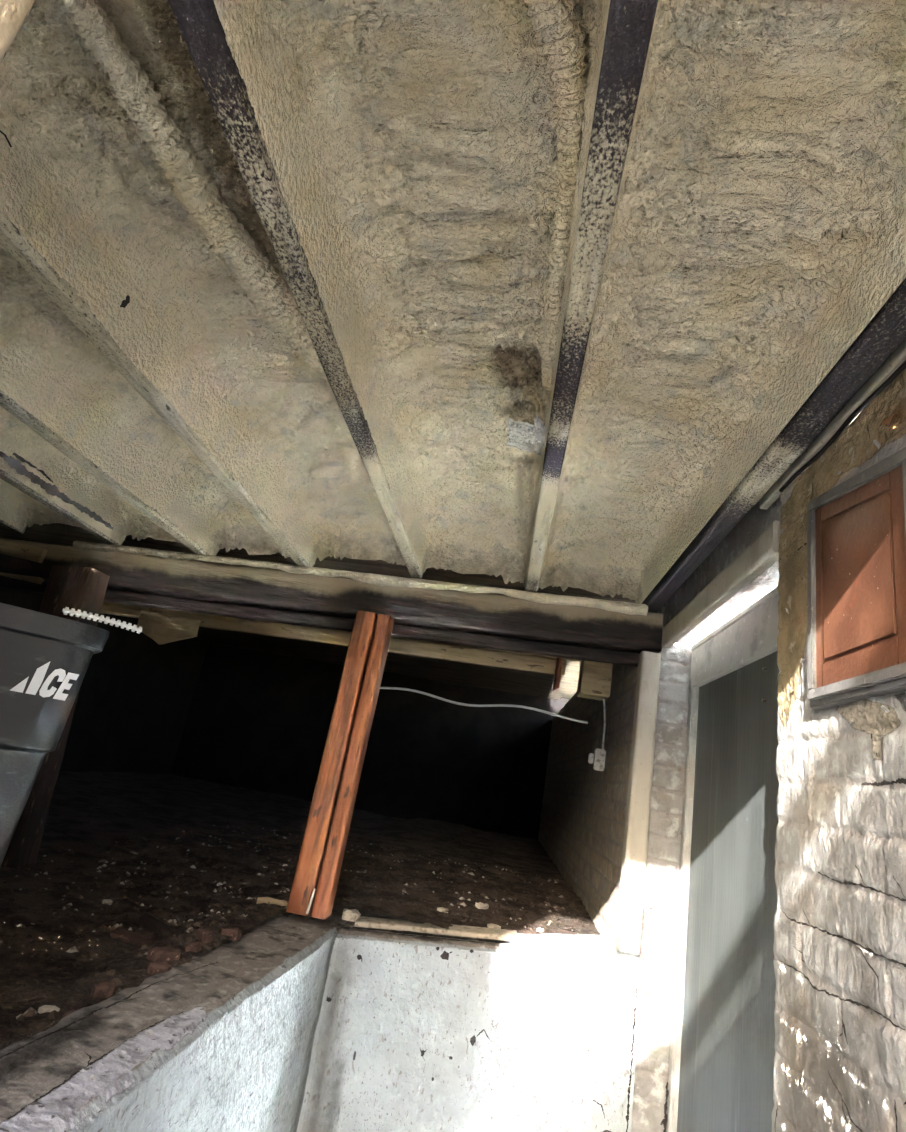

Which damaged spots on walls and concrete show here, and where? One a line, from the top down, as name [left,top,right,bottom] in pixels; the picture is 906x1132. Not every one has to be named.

crack [861,778,906,786]
peeling [0,821,302,991]
peeling [340,842,585,935]
crack [818,865,906,901]
peeling [16,986,85,1021]
crack [778,907,906,1045]
peeling [0,1006,207,1132]
crack [828,1071,863,1132]